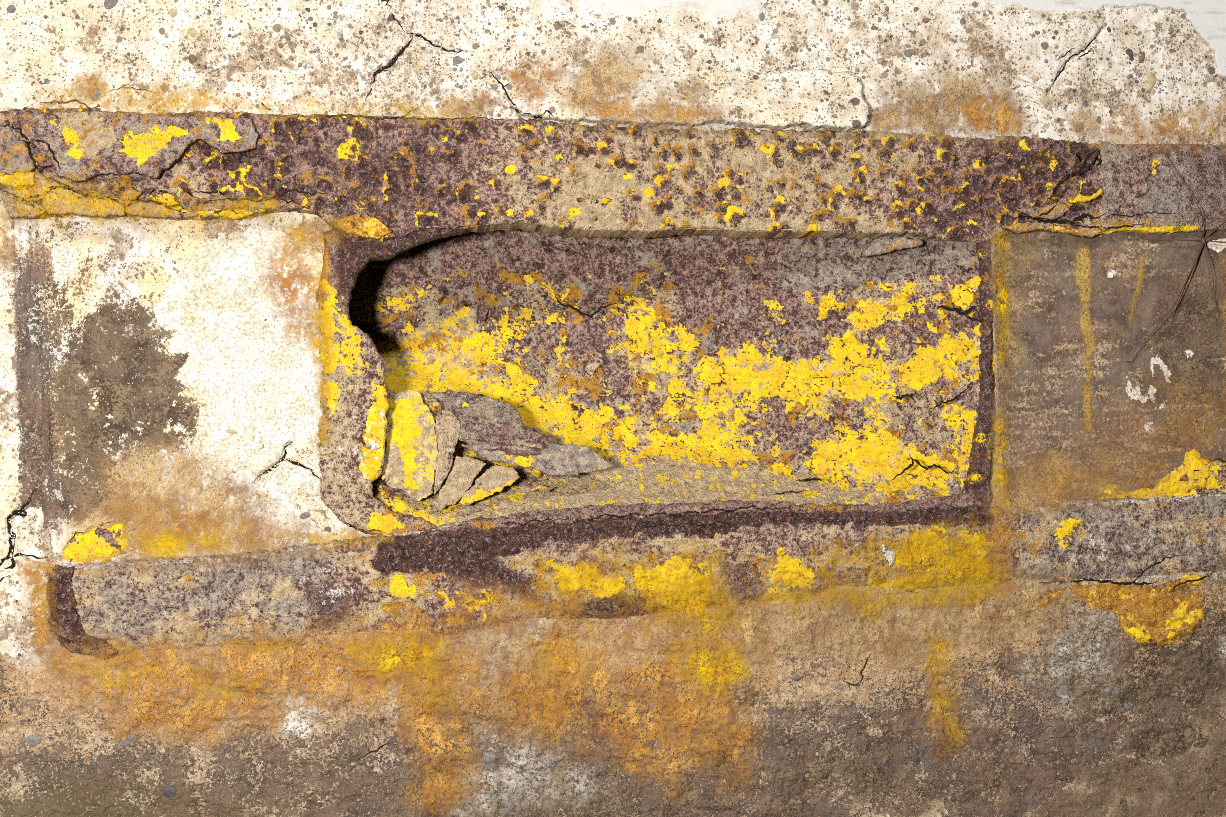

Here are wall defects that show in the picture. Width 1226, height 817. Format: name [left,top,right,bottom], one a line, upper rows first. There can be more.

crack [311,0,553,120]
crack [1049,27,1103,91]
crack [1,124,328,214]
water stain [44,242,206,527]
crack [0,493,143,582]